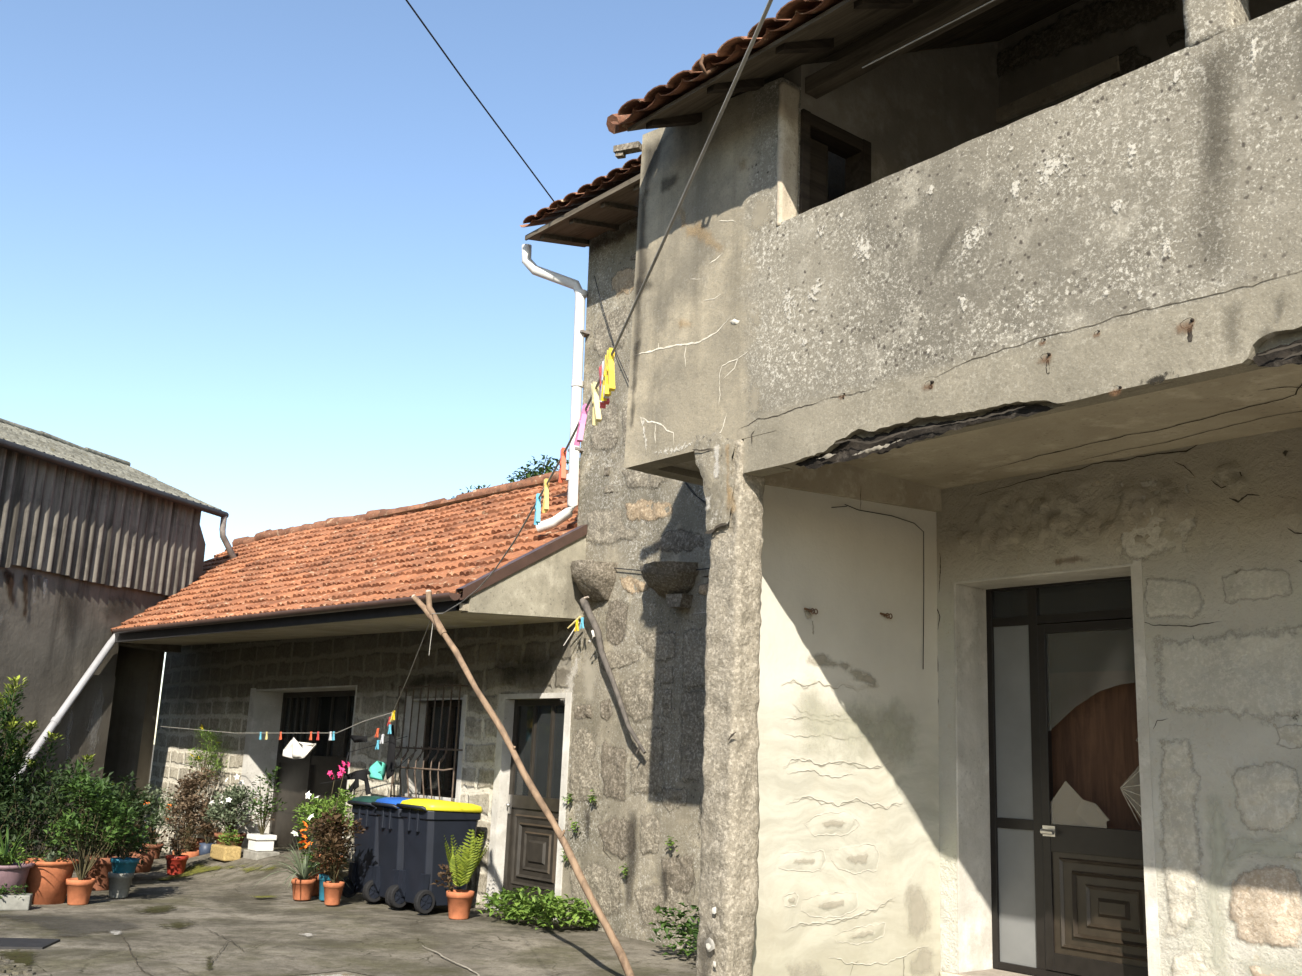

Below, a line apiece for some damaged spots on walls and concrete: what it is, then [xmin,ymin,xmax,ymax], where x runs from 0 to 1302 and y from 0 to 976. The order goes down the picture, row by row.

crack [635,295,876,444]
crack [926,271,1301,378]
spalling [1252,339,1302,367]
crack [640,417,674,451]
spalling [795,404,1055,469]
flaking render [1155,627,1302,721]
flaking render [1160,740,1202,937]
flaking render [1229,865,1302,947]
flaking render [1171,946,1217,976]